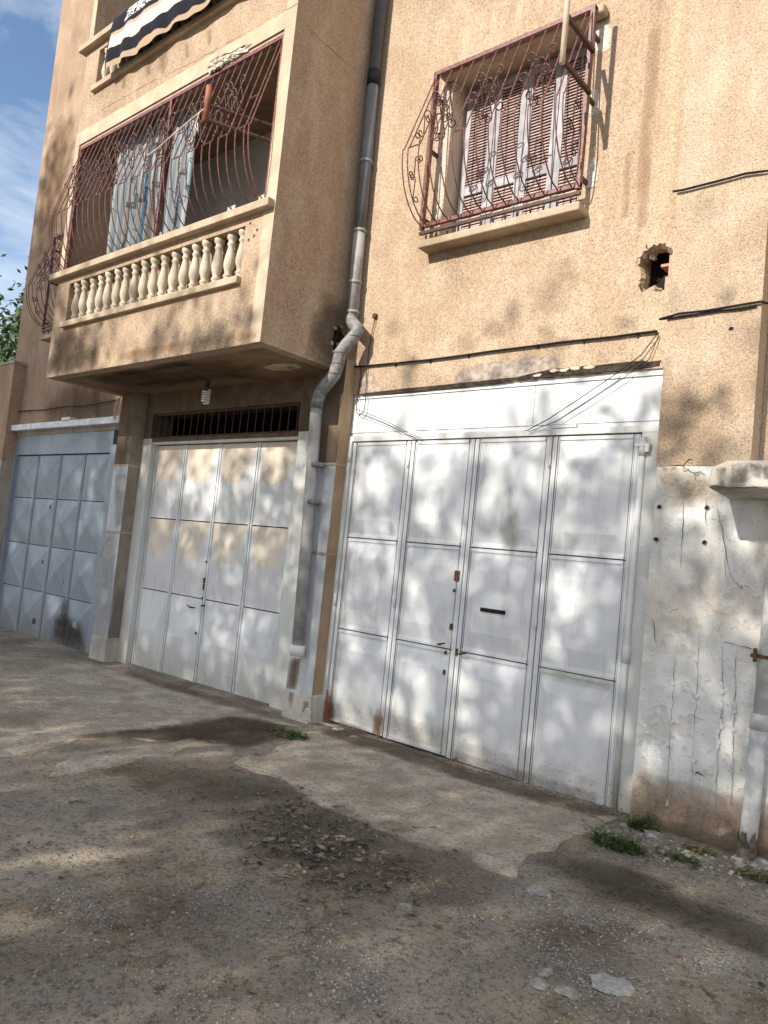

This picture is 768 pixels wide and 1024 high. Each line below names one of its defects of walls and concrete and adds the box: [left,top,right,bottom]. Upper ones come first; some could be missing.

spalling [634,228,674,307]
crack [661,459,762,589]
corrosion [323,693,332,721]
crack [652,608,752,827]